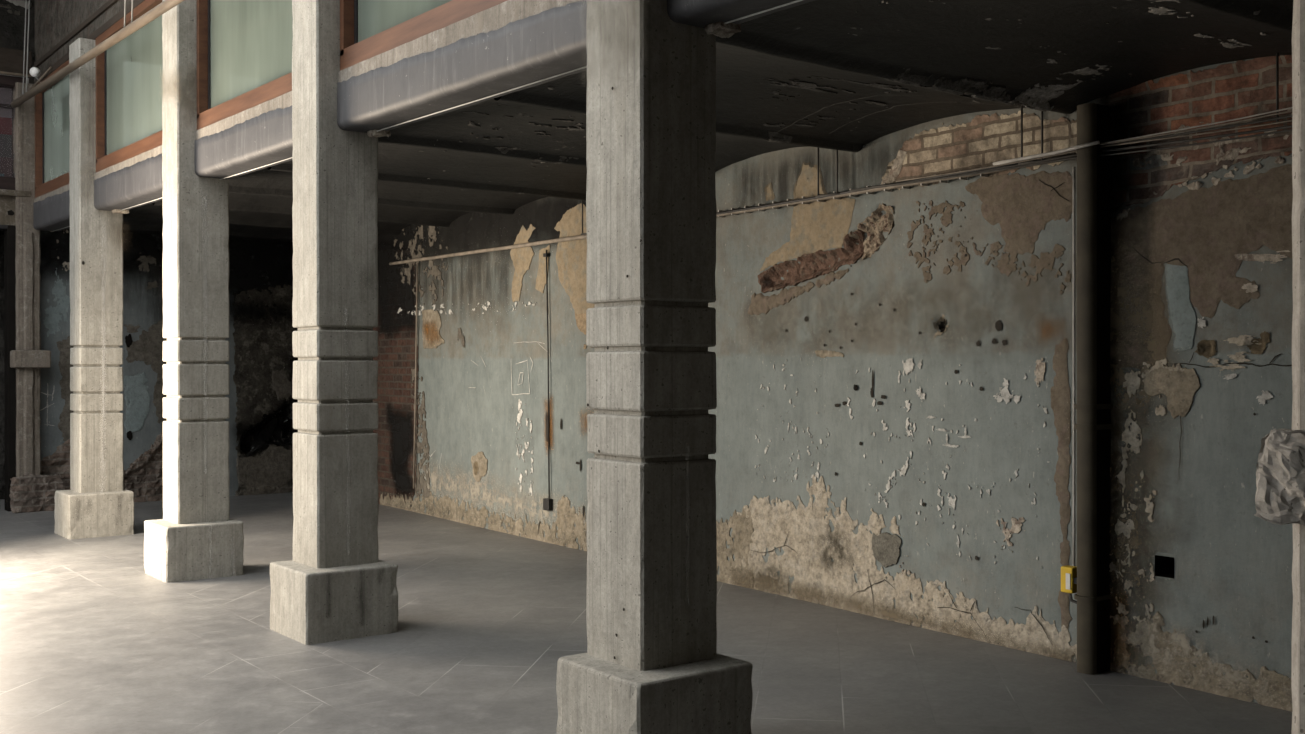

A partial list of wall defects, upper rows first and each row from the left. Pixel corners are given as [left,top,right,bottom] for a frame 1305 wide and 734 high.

peeling [1148,0,1194,18]
peeling [747,46,1112,315]
spalling [716,323,1077,663]
peeling [1109,32,1293,712]
crack [1167,353,1292,368]